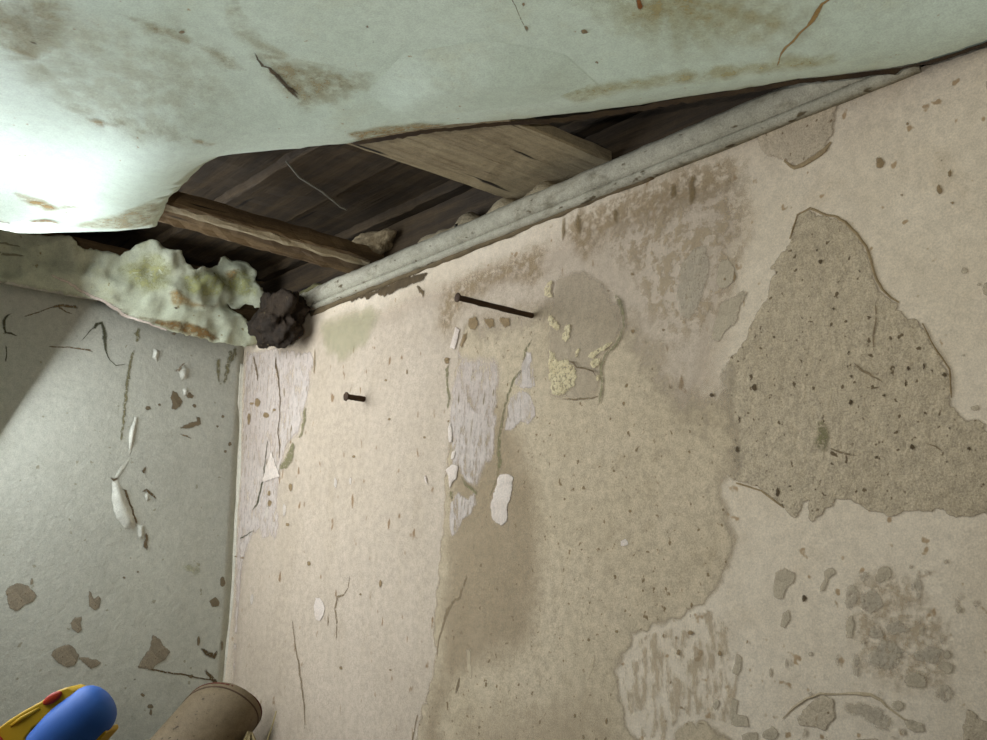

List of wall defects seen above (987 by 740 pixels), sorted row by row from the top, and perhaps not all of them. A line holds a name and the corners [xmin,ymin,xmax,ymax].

peeling [757,106,837,170]
peeling [0,230,264,347]
flaking render [350,273,427,302]
flaking render [416,207,987,740]
peeling [6,578,36,611]
peeling [71,617,82,633]
peeling [89,591,101,610]
crack [437,575,467,655]
peeling [51,644,101,669]
peeling [138,635,170,670]